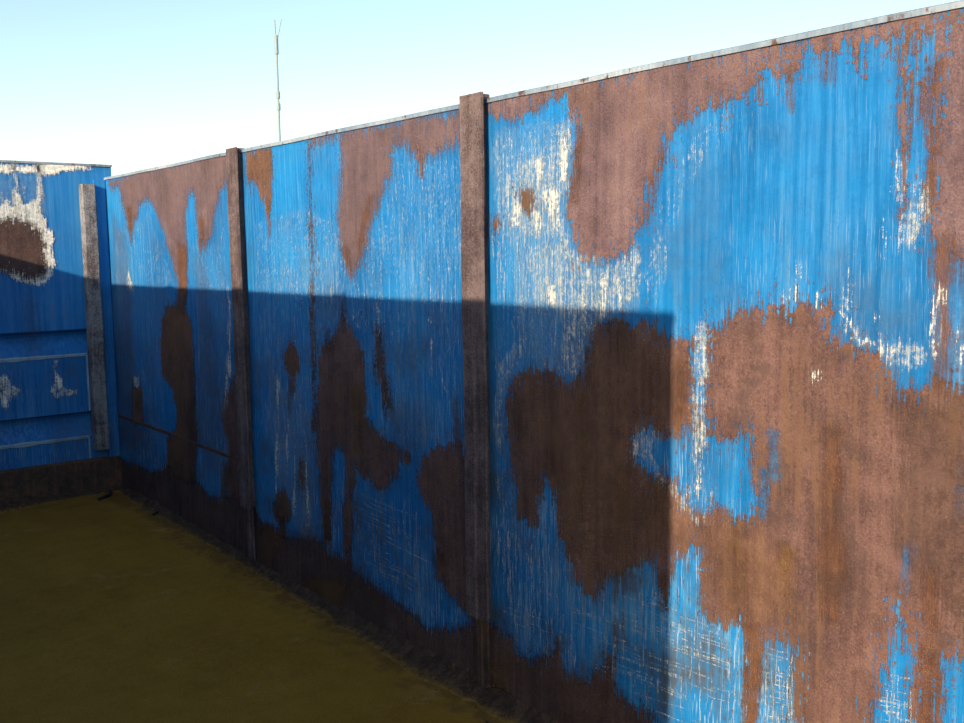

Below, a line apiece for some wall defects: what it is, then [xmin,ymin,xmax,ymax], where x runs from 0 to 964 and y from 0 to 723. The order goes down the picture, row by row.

peeling [0,162,93,286]
rust [108,156,227,489]
rust [220,369,240,503]
rust [243,147,277,236]
rust [270,109,470,623]
peeling [503,125,660,376]
rust [486,8,964,723]